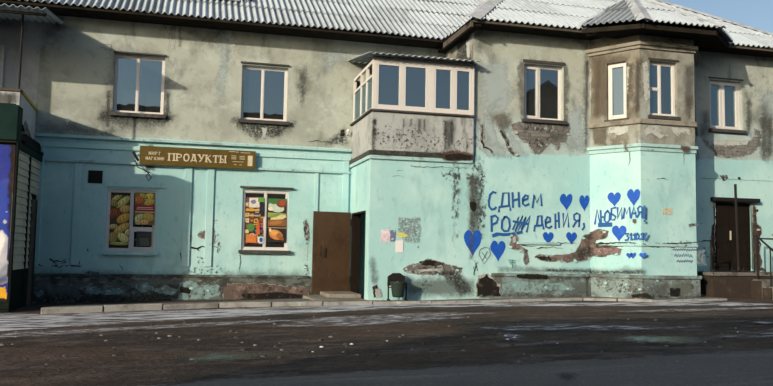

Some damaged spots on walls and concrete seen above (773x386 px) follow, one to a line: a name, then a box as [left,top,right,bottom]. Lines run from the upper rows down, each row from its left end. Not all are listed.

water stain [372,119,469,160]
flaking render [375,62,570,157]
peeling [644,125,690,139]
flaking render [702,129,761,158]
water stain [761,92,773,156]
water stain [470,166,484,232]
peeling [190,220,221,251]
flaking render [667,201,716,270]
flaking render [134,257,310,300]
flaking render [403,258,463,276]
peeling [476,229,622,297]